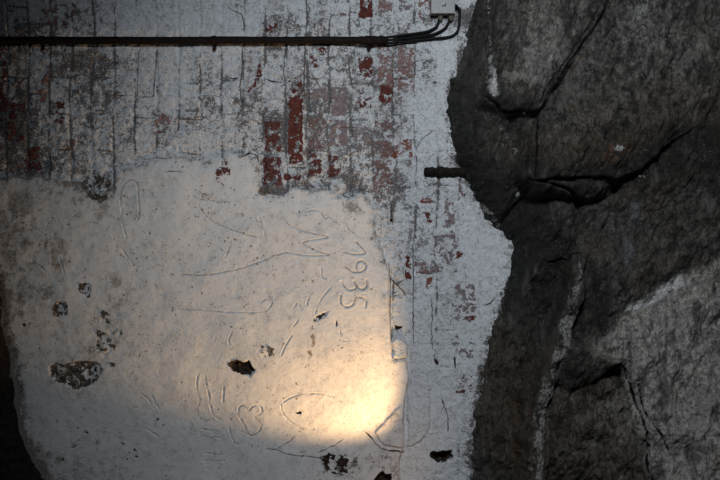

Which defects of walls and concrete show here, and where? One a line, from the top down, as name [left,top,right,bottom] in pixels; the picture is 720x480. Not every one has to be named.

peeling [358,43,415,108]
peeling [263,80,412,194]
flaking render [52,301,68,317]
flaking render [96,329,123,351]
flaking render [50,361,115,390]
flaking render [228,360,255,375]
flaking render [319,453,357,474]
spalling [430,450,453,463]